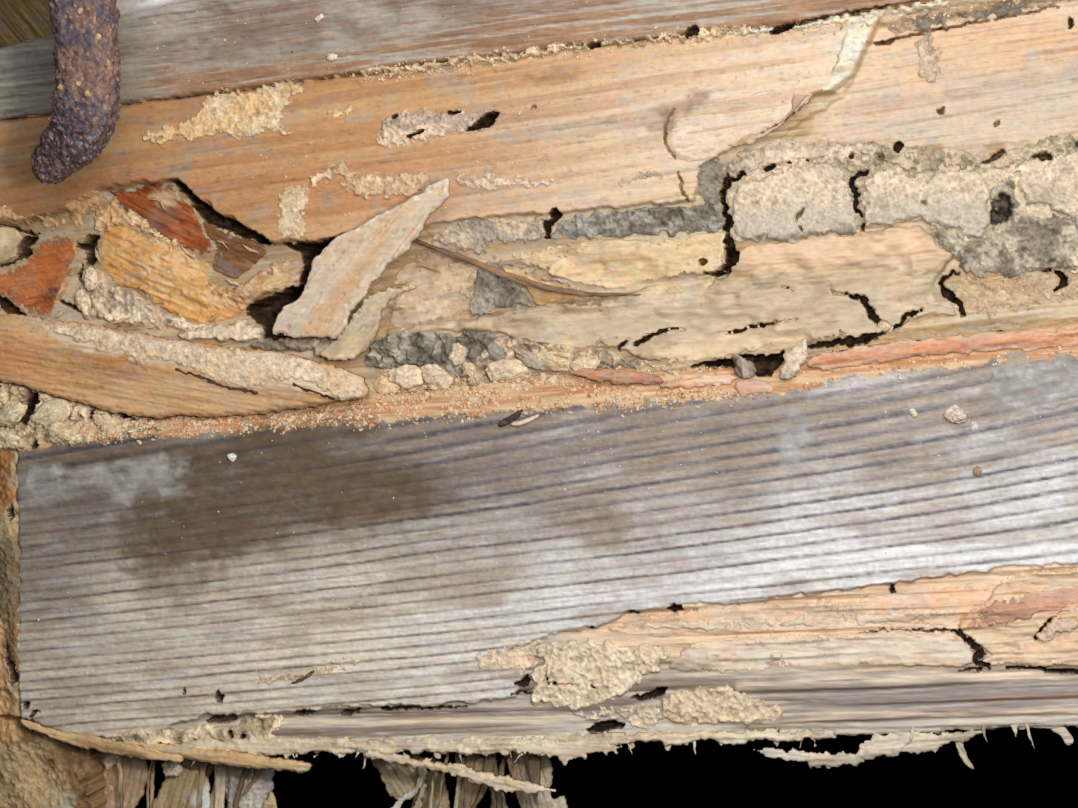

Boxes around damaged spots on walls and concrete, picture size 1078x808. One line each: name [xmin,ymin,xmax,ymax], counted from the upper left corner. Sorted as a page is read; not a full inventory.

corrosion [31,0,122,186]
spalling [990,192,1014,225]
peeling [0,227,77,319]
spalling [165,178,342,341]
peeling [732,354,757,379]
peeling [779,339,808,379]
crack [1034,617,1053,640]
peeling [1036,608,1078,642]
crack [859,627,991,673]
peeling [511,736,622,766]